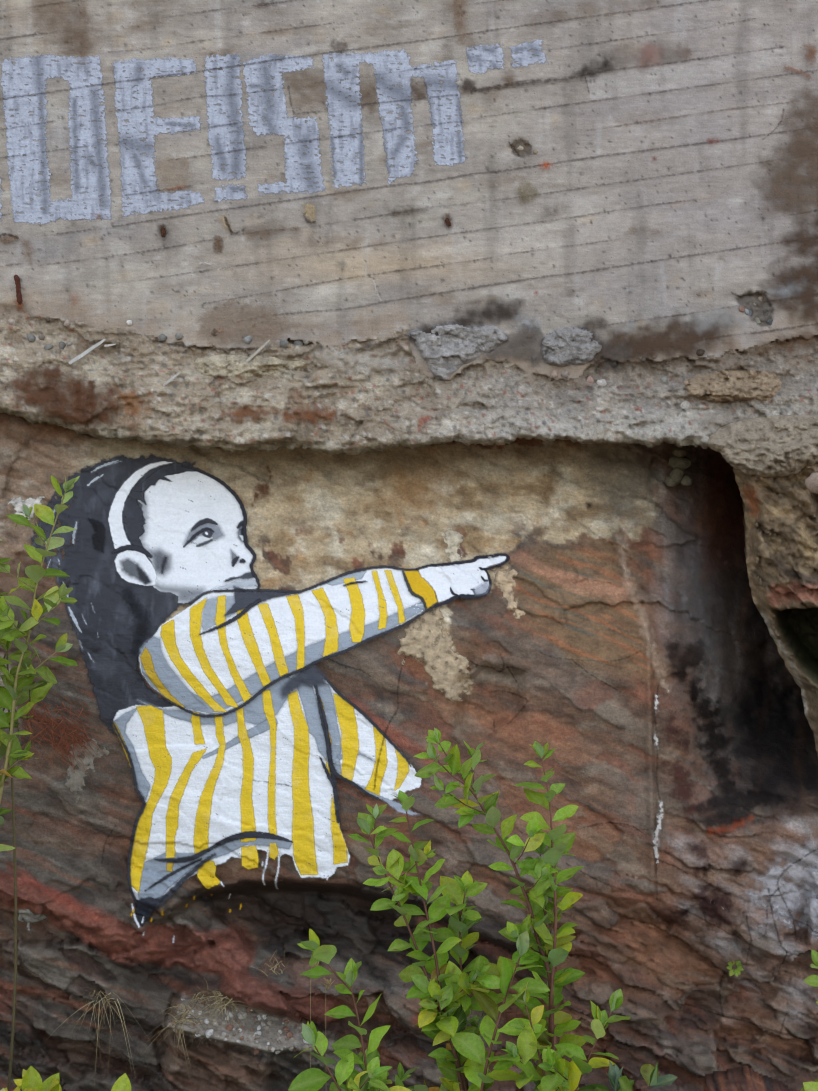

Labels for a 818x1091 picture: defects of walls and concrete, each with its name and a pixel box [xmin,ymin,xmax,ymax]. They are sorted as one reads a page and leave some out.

damp [764,91,818,320]
spalling [0,233,19,244]
spalling [214,217,244,252]
corrosion [14,275,23,311]
spalling [731,290,773,325]
spalling [194,352,306,379]
spalling [406,322,509,381]
spalling [540,326,602,367]